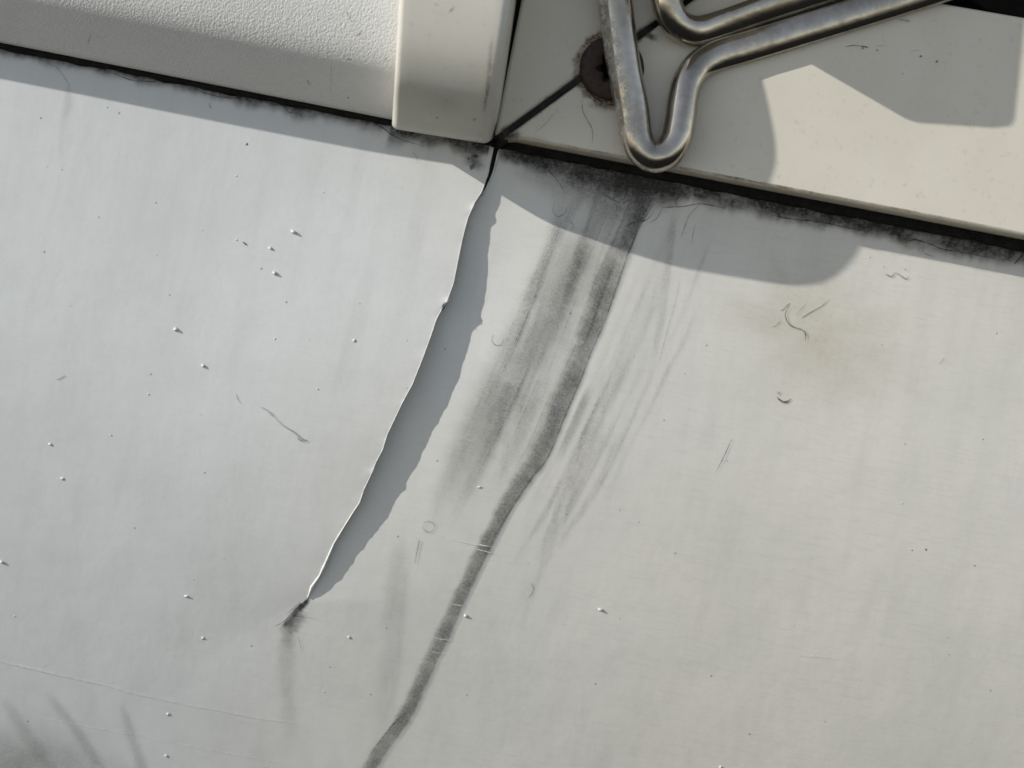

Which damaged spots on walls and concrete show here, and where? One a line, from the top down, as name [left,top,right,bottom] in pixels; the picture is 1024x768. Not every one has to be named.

crack [283,148,500,626]